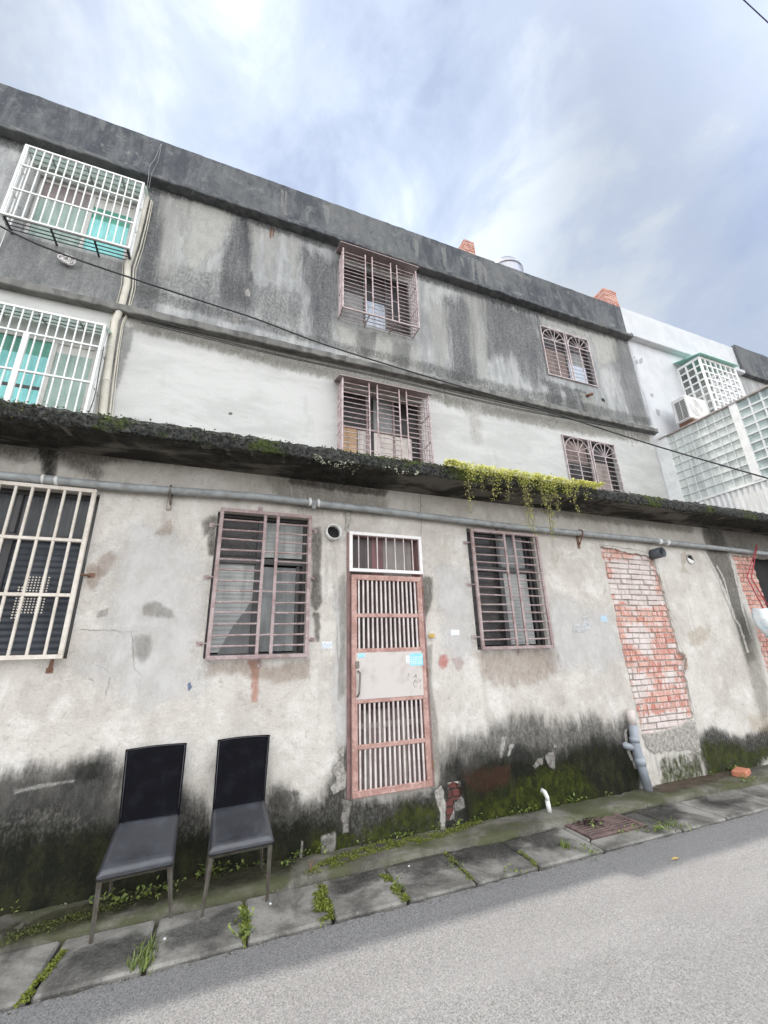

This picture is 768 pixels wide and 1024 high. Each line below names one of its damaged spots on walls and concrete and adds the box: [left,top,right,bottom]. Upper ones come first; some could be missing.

damp [133,184,644,446]
damp [266,528,639,849]
damp [699,726,768,775]
damp [0,754,121,847]
damp [177,794,210,842]
flaking render [446,782,462,820]